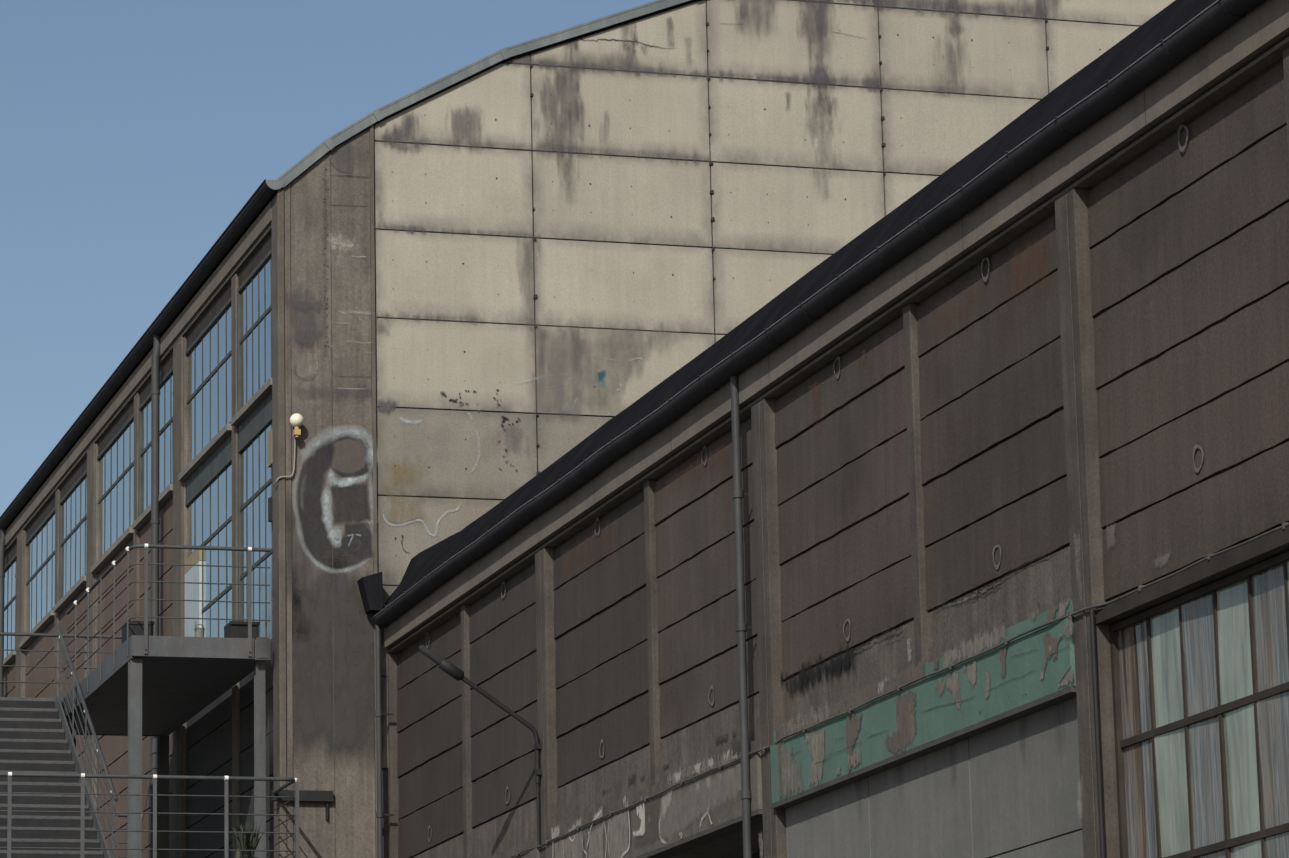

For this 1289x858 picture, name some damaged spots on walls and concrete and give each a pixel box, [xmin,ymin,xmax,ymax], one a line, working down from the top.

leakage [512,40,676,127]
leakage [787,0,833,111]
leakage [853,0,1058,77]
peeling [776,624,1006,798]
peeling [552,750,741,858]